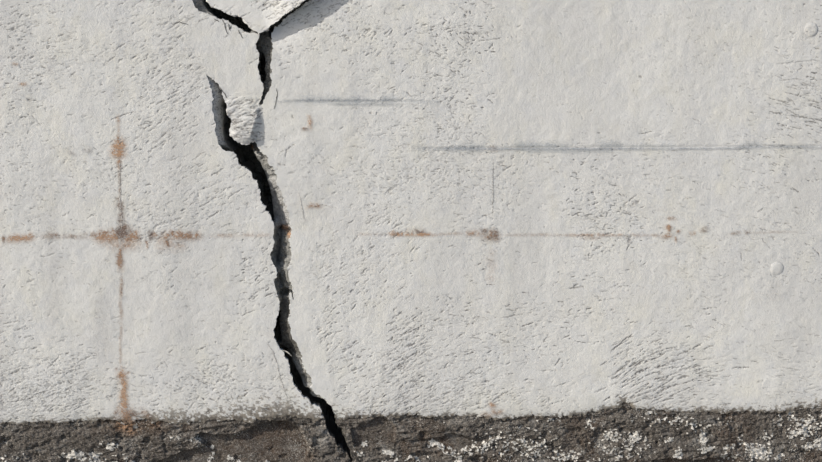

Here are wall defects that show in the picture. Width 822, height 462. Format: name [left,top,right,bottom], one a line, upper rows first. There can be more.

crack [174,0,310,108]
rust [95,204,138,267]
rust [147,231,198,246]
crack [206,75,352,462]
rust [115,370,136,431]